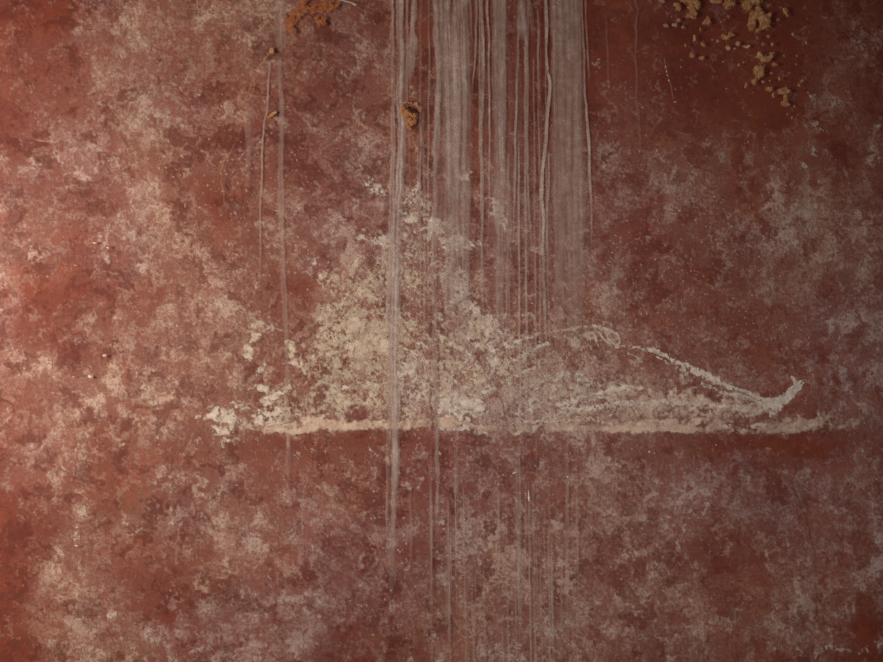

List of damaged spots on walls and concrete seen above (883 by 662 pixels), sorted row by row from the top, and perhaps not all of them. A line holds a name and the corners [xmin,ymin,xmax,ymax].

rust [281,0,339,47]
damp [432,0,527,211]
damp [538,0,615,254]
peeling [658,0,809,119]
damp [369,0,417,480]